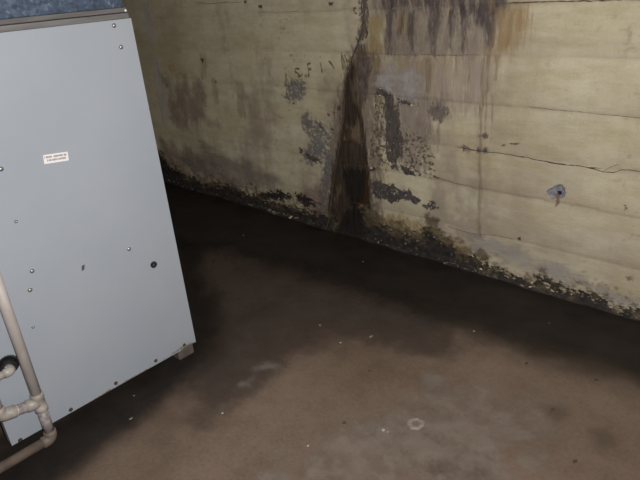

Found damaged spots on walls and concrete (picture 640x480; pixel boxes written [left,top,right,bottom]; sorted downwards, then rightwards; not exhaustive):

damp [356,0,369,41]
damp [164,43,640,379]
damp [373,0,504,174]
spalling [359,180,640,321]
crack [460,145,640,173]
damp [0,238,454,480]